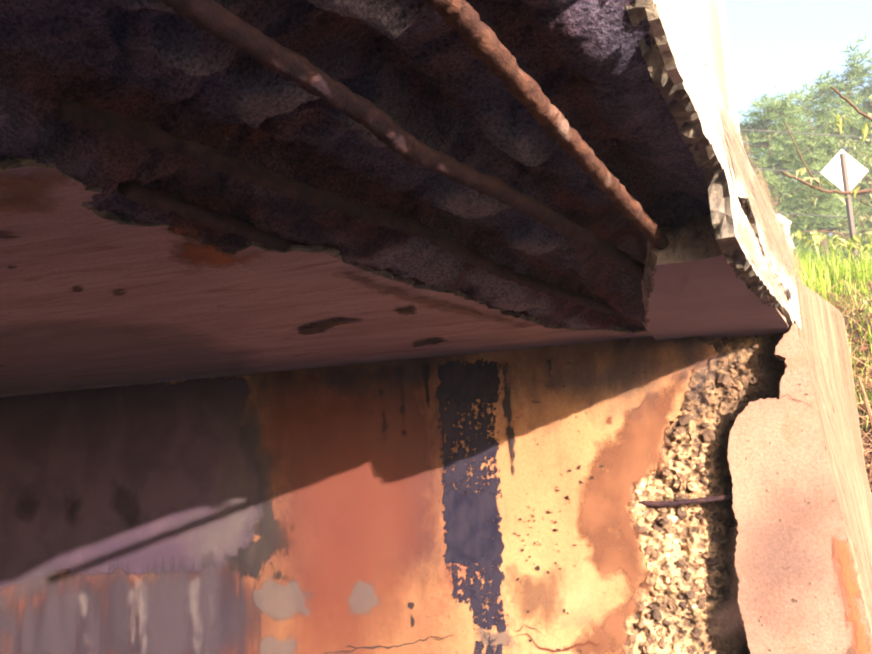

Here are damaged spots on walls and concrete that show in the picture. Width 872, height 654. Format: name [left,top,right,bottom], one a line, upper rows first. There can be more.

spalling [0,0,648,332]
spalling [465,0,713,228]
spalling [298,318,361,335]
water stain [530,340,661,392]
water stain [0,417,294,654]
crack [323,635,453,654]
crack [509,625,601,653]
spalling [624,333,786,654]